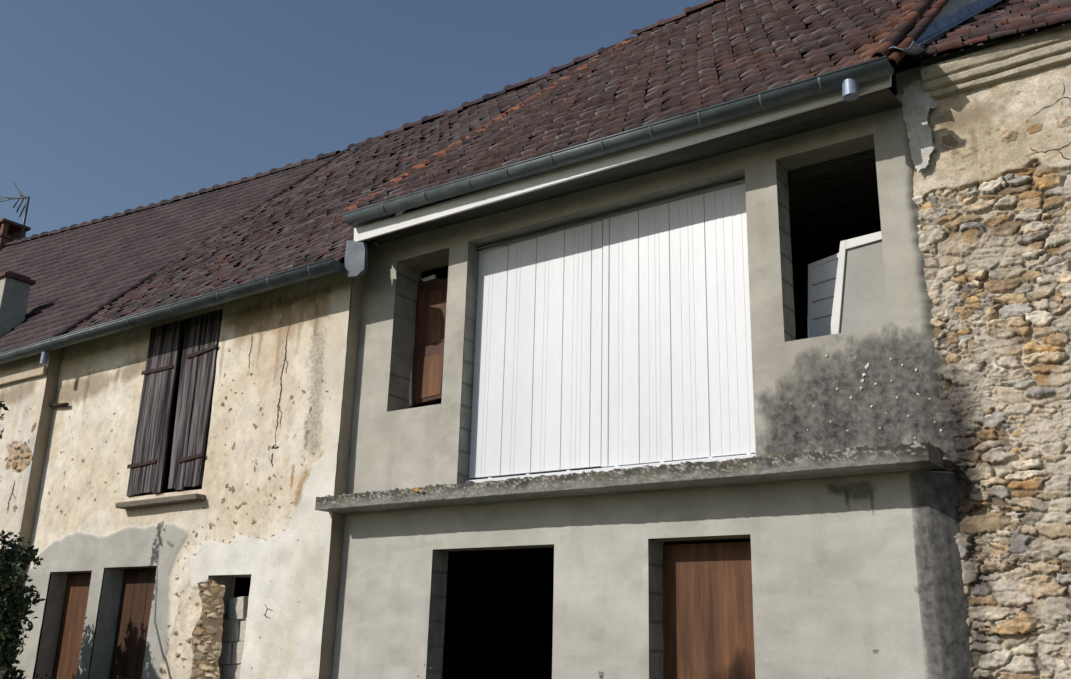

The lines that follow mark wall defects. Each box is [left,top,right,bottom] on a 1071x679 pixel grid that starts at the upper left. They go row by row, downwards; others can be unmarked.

crack [1025,142,1071,159]
flaking render [0,423,36,473]
crack [271,306,291,466]
damp [829,482,873,508]
damp [760,337,954,456]
flaking render [157,452,314,679]
damp [910,472,976,679]